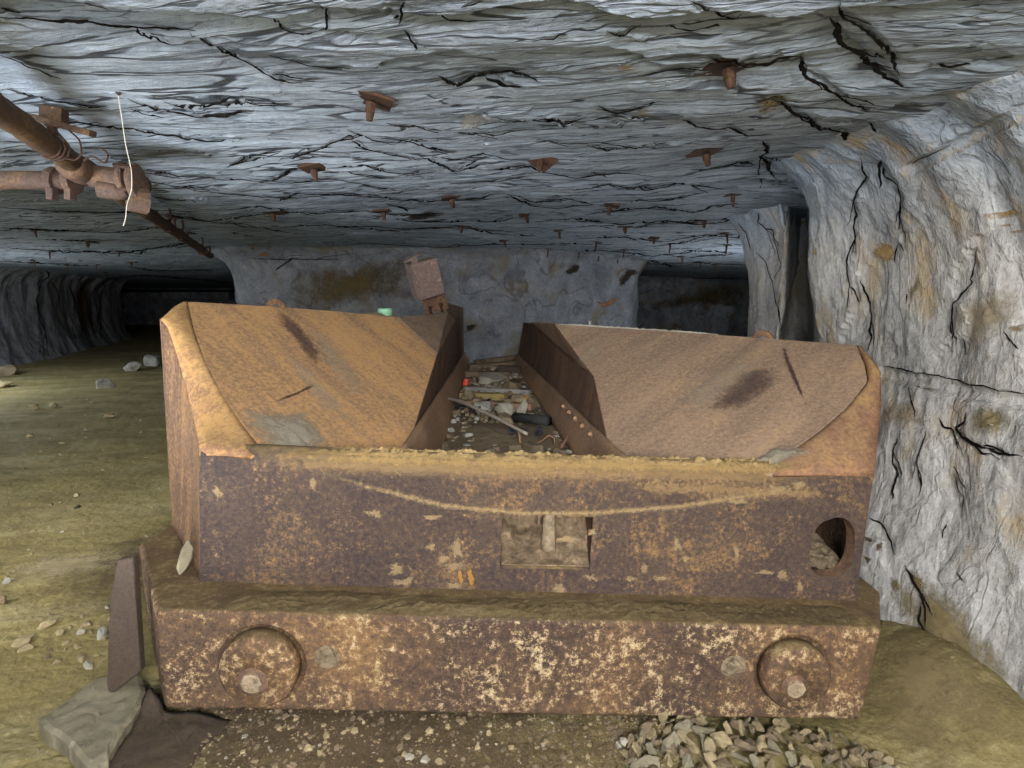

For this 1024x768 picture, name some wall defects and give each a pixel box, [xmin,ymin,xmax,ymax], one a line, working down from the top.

crack [0,1,783,359]
crack [645,56,1024,538]
crack [830,1,910,88]
crack [870,518,933,631]